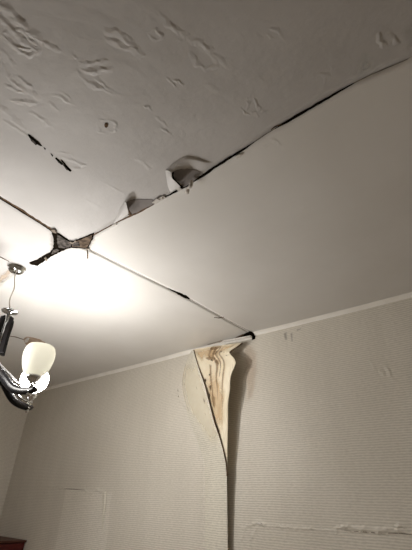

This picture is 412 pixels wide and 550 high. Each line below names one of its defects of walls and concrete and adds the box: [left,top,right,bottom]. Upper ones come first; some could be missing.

crack [93,59,408,236]
peeling [165,156,212,194]
crack [0,196,52,232]
peeling [113,198,163,224]
spalling [29,229,94,266]
crack [89,249,249,331]